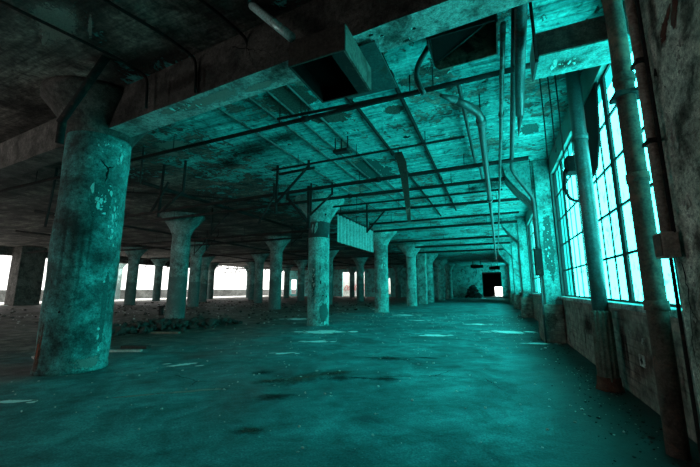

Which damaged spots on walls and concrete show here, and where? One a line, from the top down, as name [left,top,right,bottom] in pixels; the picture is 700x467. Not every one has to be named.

peeling [90,183,118,246]